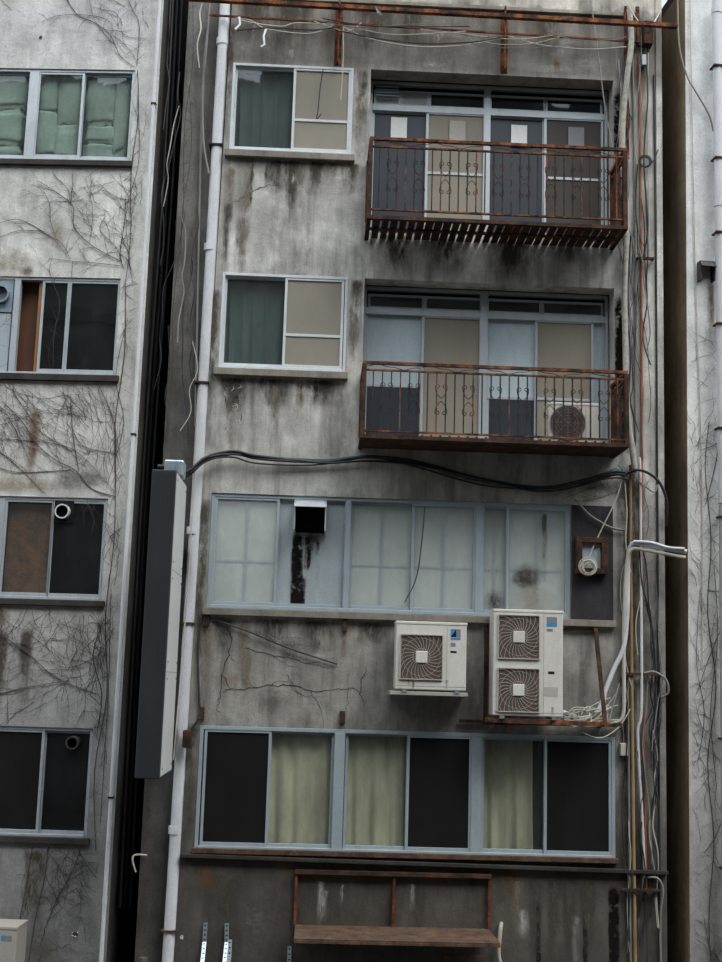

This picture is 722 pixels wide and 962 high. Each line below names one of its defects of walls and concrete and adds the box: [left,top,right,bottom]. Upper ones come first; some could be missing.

leakage [224,162,254,257]
leakage [265,160,335,202]
leakage [348,164,358,184]
leakage [512,880,594,962]
leakage [608,888,619,962]